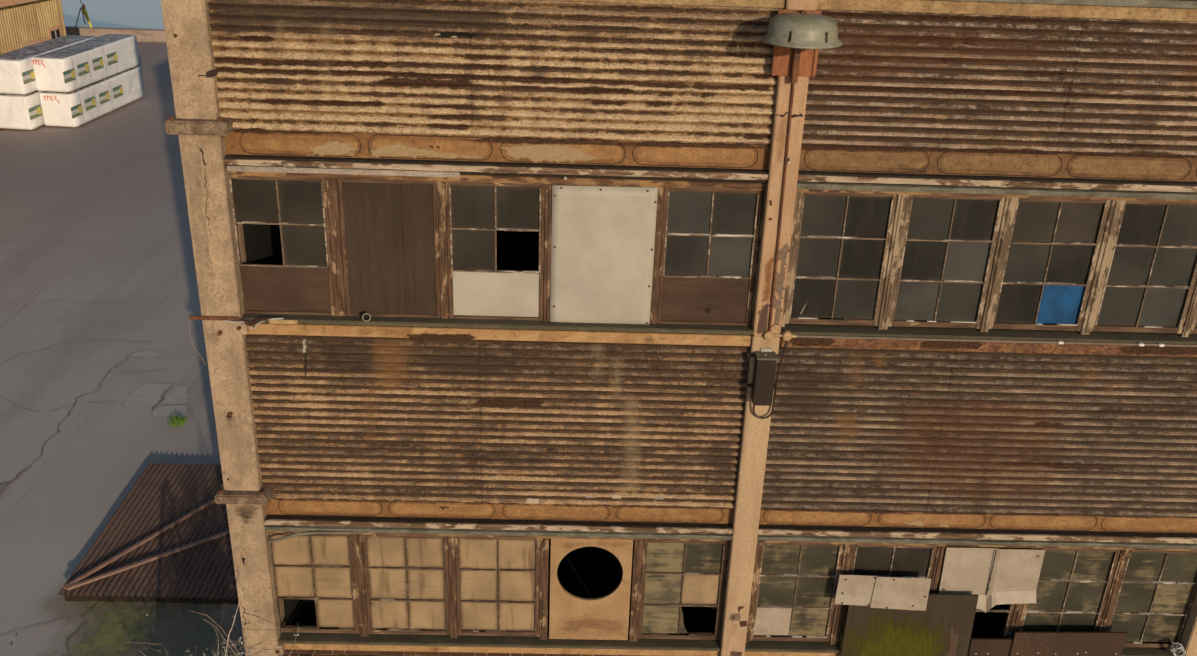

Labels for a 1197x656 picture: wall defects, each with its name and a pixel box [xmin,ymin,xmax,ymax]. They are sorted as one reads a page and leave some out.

corrosion [822,11,1054,22]
corrosion [888,35,975,44]
corrosion [214,54,772,107]
corrosion [808,70,1197,101]
corrosion [422,104,770,149]
corrosion [801,143,1197,158]
crack [197,145,211,236]
peeling [757,243,790,335]
corrosion [920,341,982,349]
corrosion [1120,346,1197,355]
corrosion [1003,461,1120,470]
spalling [730,606,747,627]